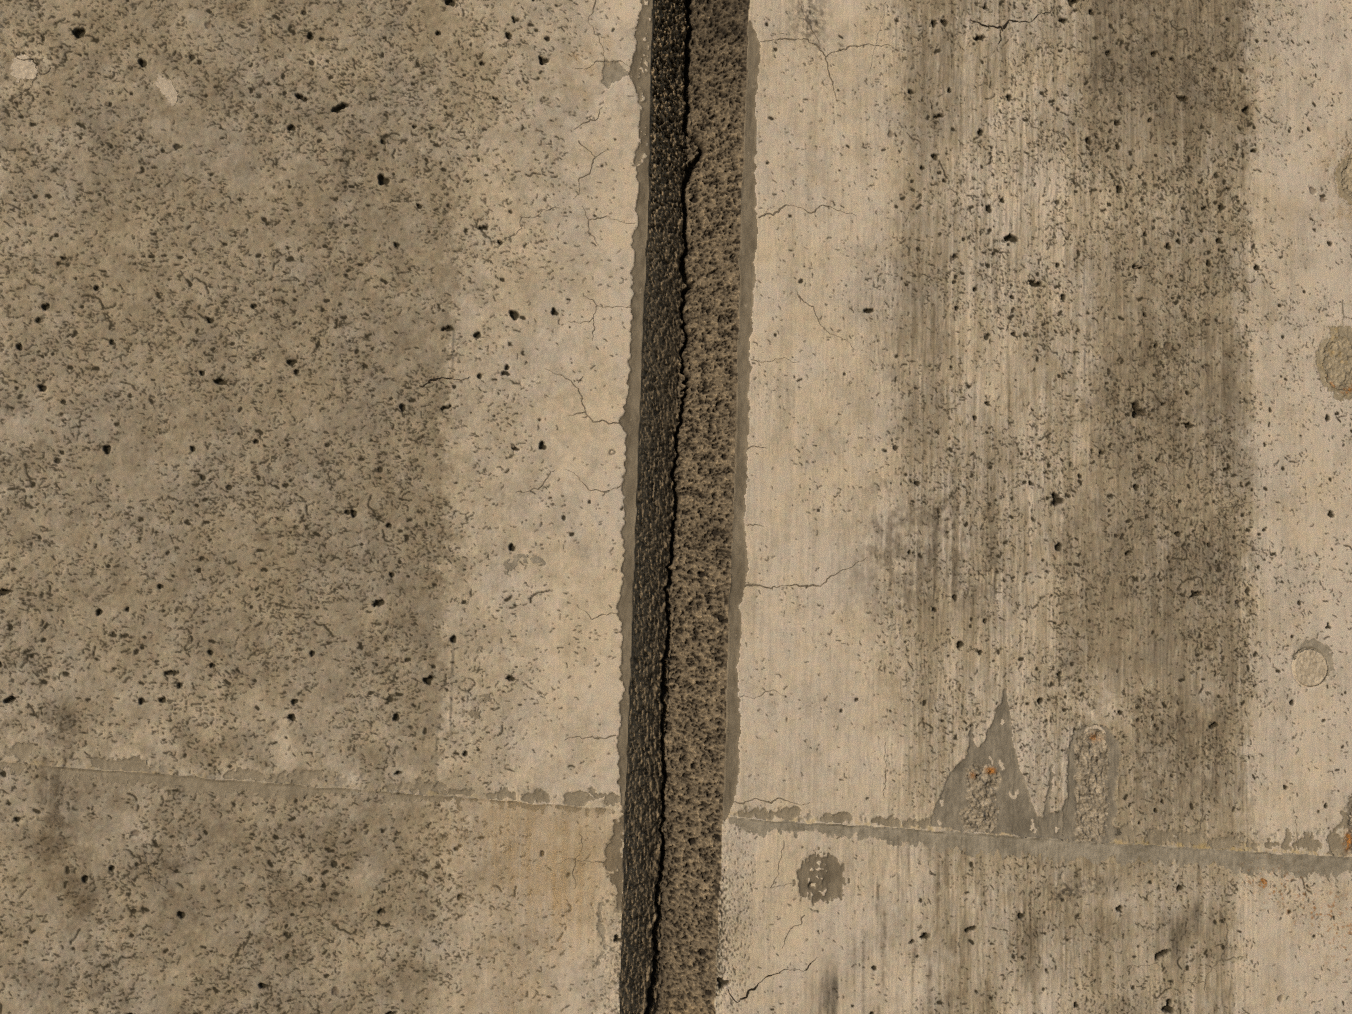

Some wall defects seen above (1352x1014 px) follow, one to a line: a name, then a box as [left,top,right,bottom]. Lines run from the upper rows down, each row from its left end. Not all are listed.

crack [575,0,634,70]
crack [501,108,629,242]
crack [567,295,631,339]
crack [544,368,623,424]
crack [517,468,621,493]
peeling [723,20,1352,880]